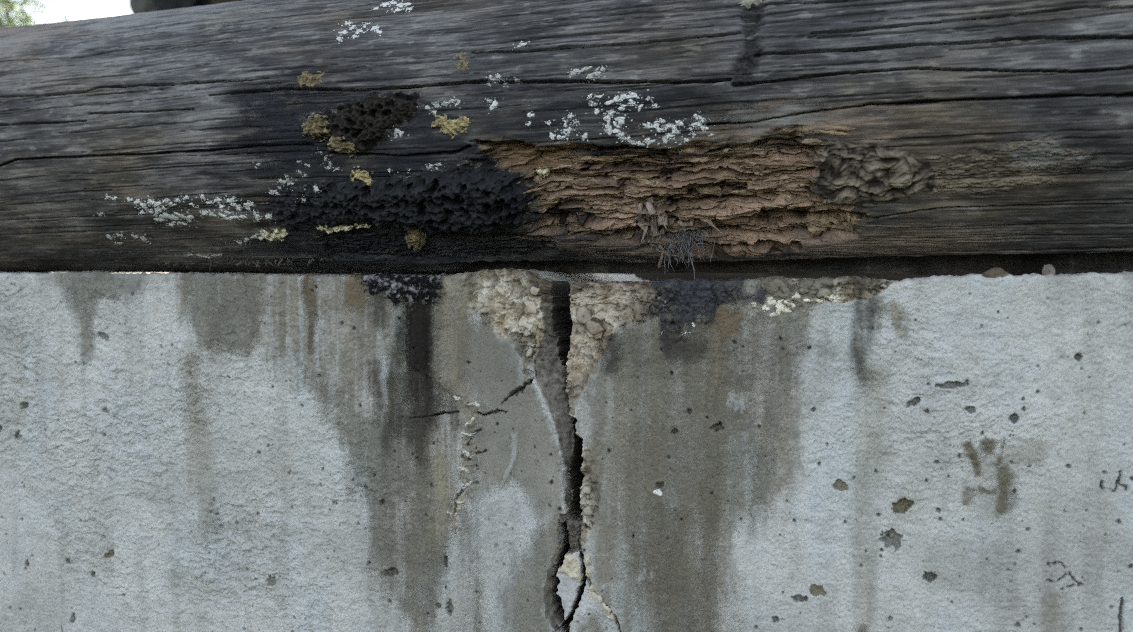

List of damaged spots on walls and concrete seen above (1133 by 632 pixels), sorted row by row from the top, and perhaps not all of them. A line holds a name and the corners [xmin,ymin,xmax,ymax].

leakage [55,270,139,355]
spalling [464,268,662,416]
leakage [853,275,906,375]
leakage [179,272,568,632]
crack [520,280,621,632]
leakage [587,276,840,632]
crack [1100,471,1133,492]
crack [1046,561,1083,587]
crack [1117,597,1125,632]